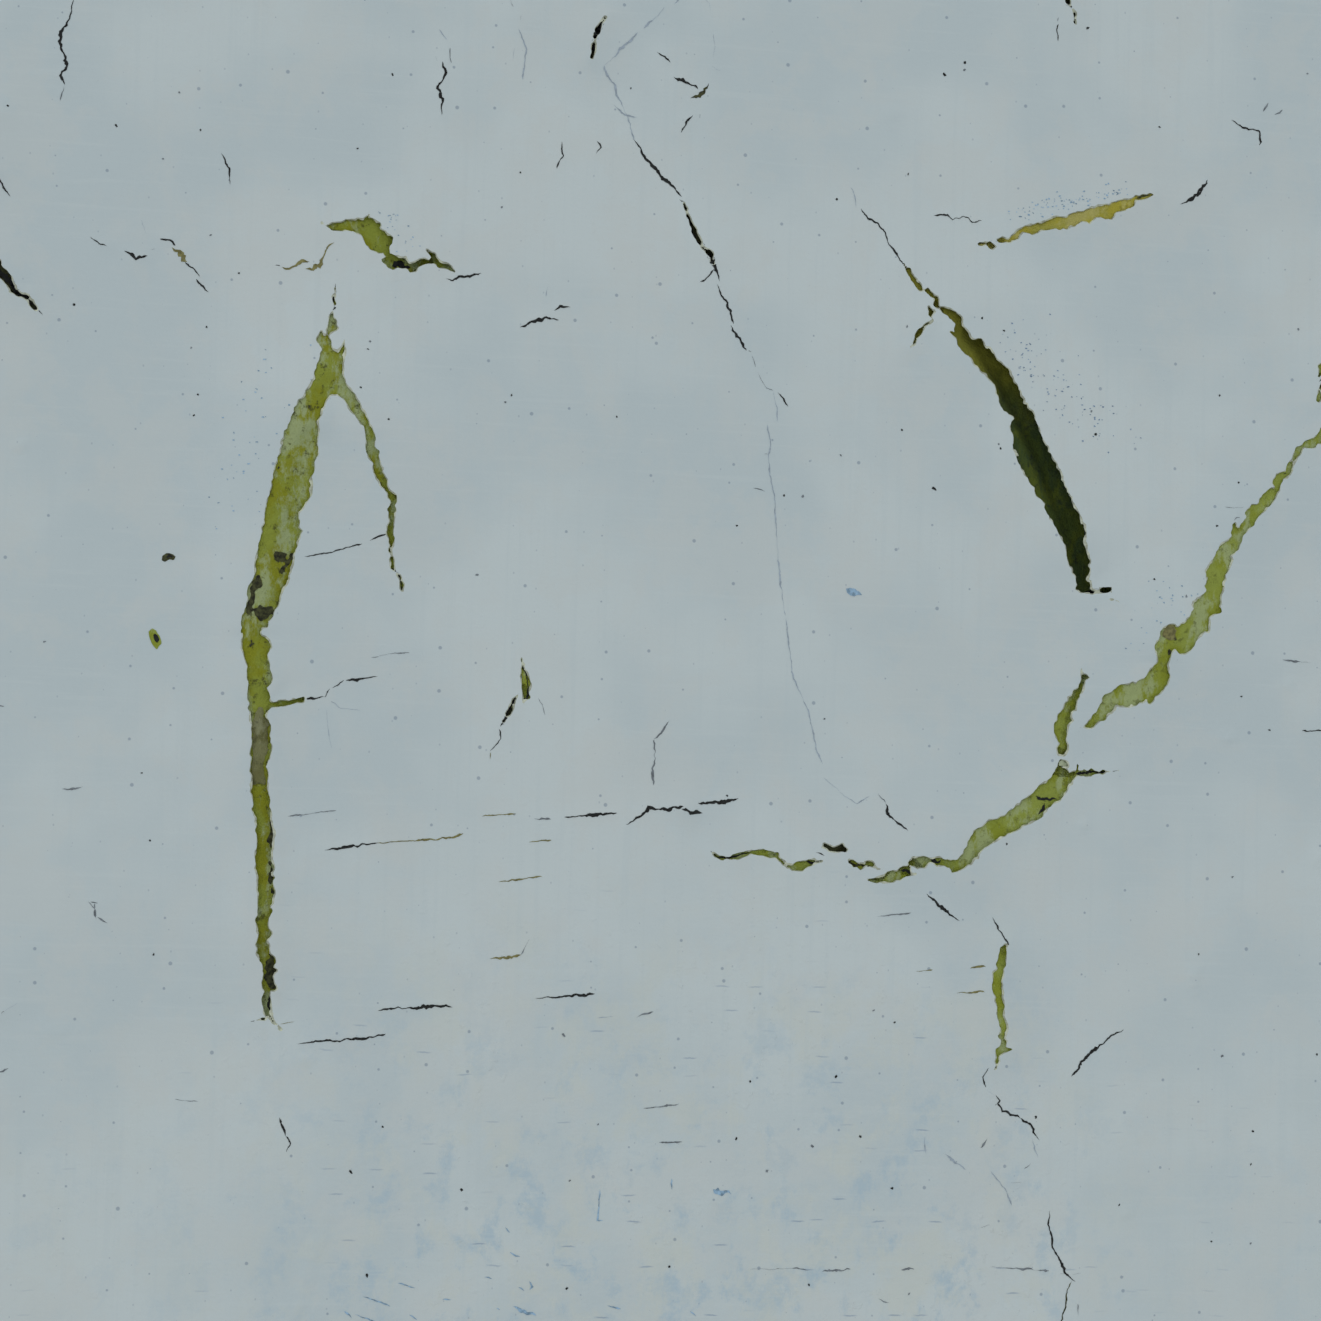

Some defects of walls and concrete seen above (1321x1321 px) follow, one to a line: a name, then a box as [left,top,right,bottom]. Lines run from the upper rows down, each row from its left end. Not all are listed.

crack [58,2,73,99]
crack [0,259,42,314]
crack [521,291,568,327]
crack [590,0,1321,920]
crack [241,214,480,1044]
crack [490,657,545,757]
crack [328,720,738,850]
crack [491,940,529,960]
crack [537,993,652,1018]
crack [924,919,1038,1205]
crack [1072,1030,1123,1076]
crack [997,1211,1079,1321]